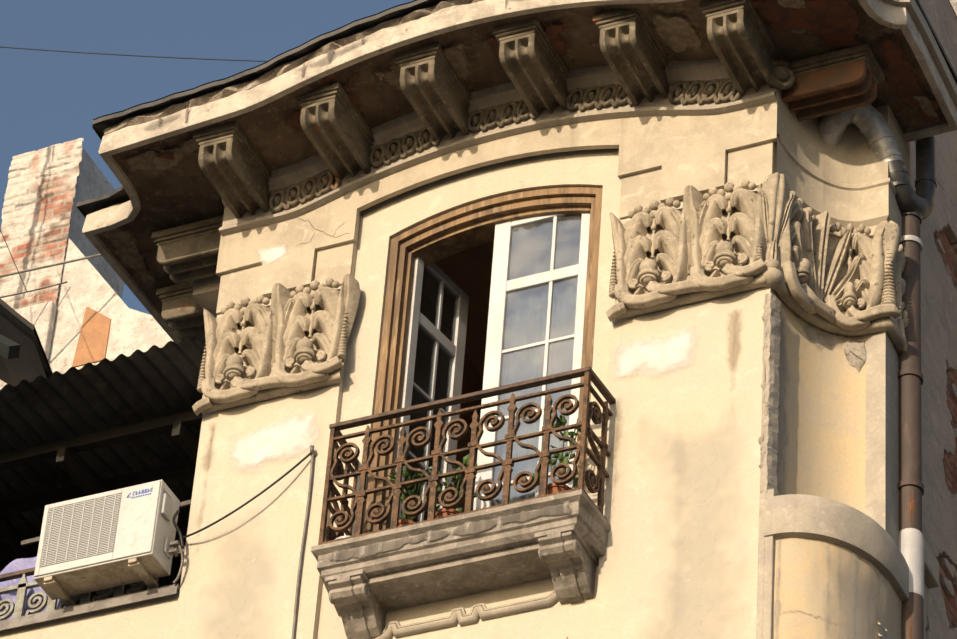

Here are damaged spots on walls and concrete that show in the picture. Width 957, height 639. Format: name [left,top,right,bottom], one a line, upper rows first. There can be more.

spalling [933,229,957,289]
spalling [943,369,957,494]
water stain [842,579,877,639]
spalling [936,554,957,628]